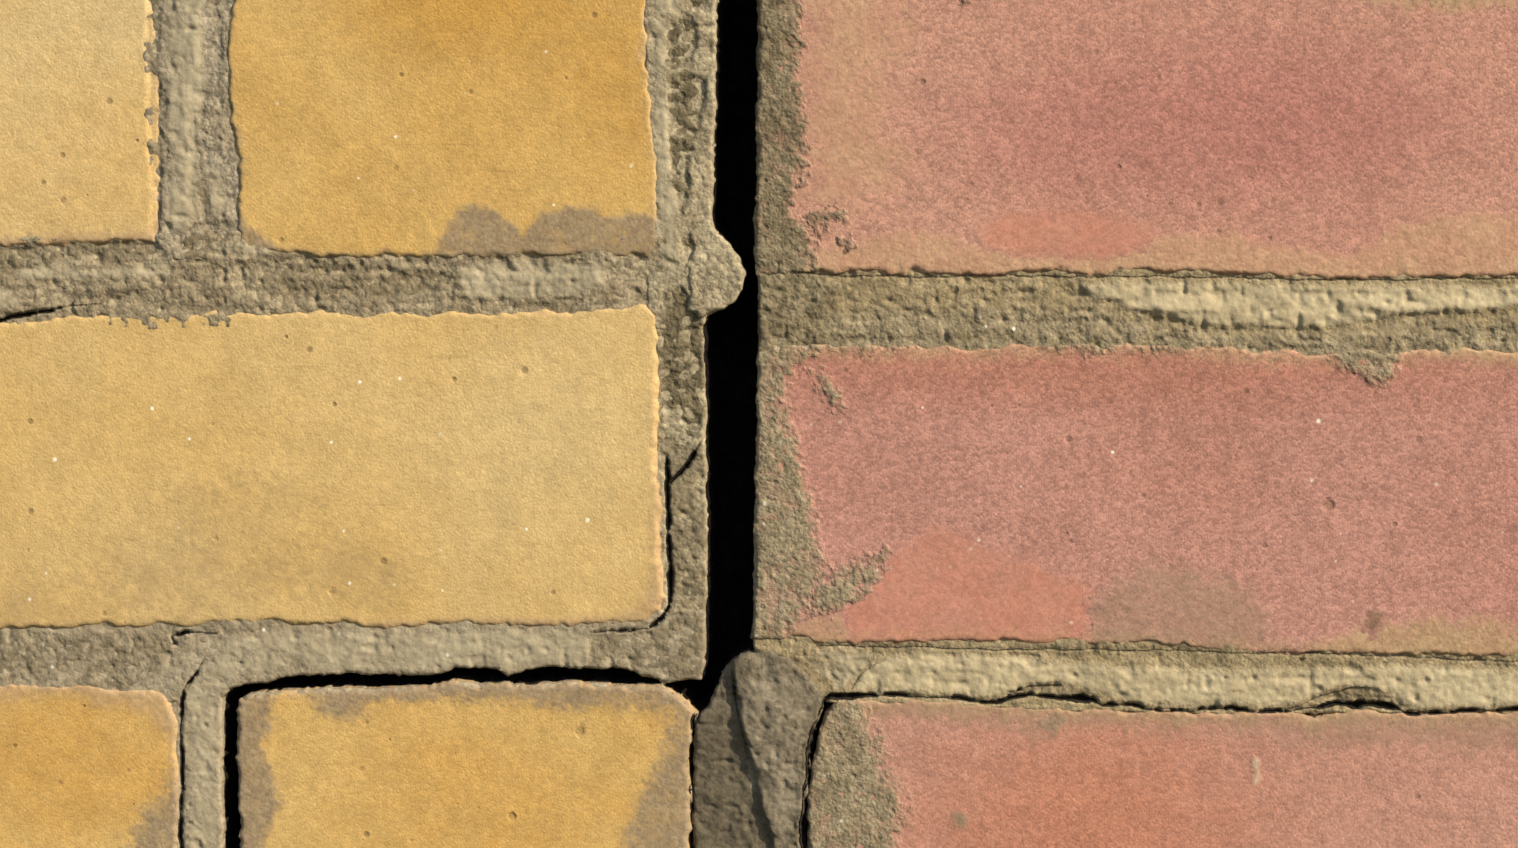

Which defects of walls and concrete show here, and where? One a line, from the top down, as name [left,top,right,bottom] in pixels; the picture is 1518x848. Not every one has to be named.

spalling [0,0,459,310]
crack [224,0,758,848]
crack [172,631,216,848]
crack [800,645,1518,848]